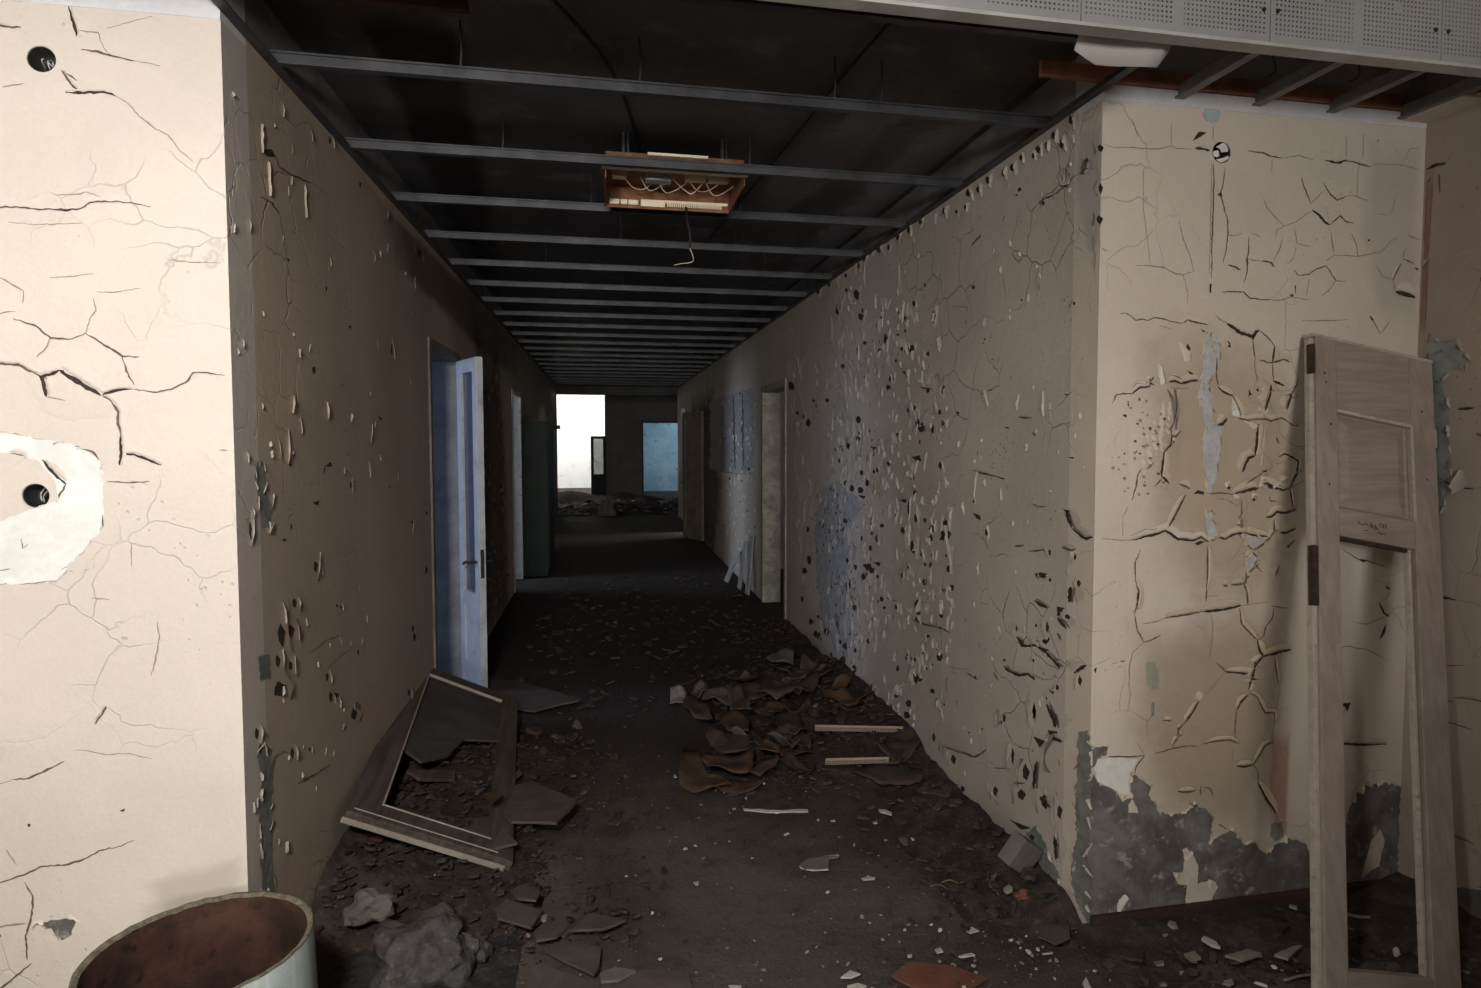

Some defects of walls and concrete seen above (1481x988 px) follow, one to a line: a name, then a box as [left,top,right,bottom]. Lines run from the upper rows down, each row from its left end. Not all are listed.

crack [61,6,193,162]
crack [0,192,151,225]
peeling [261,103,308,218]
peeling [32,526,103,584]
crack [0,274,225,526]
peeling [247,396,303,542]
spalling [788,111,1310,923]
crack [863,119,1481,861]
peeling [1426,333,1471,516]
crack [0,750,151,784]
spalling [1345,780,1415,883]
crack [0,840,134,988]